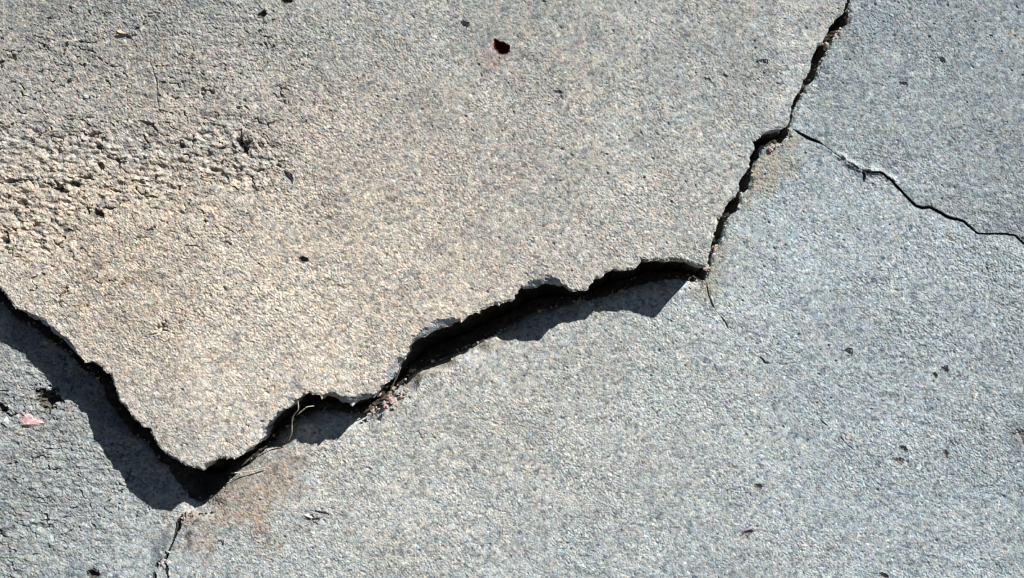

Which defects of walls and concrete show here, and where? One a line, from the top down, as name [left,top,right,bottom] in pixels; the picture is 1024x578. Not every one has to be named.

crack [863,171,1024,244]
crack [0,0,852,511]
crack [154,509,195,578]